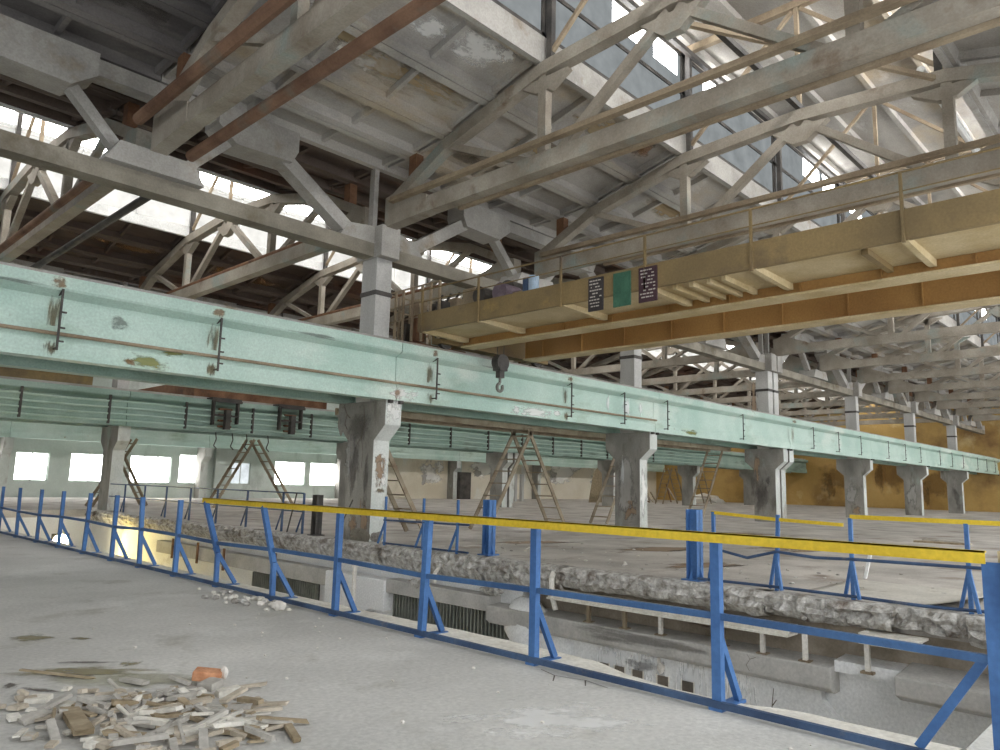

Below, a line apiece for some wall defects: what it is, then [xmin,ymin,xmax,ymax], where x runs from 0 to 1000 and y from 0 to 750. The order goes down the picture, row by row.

corrosion [48,301,60,326]
peeling [514,406,561,418]